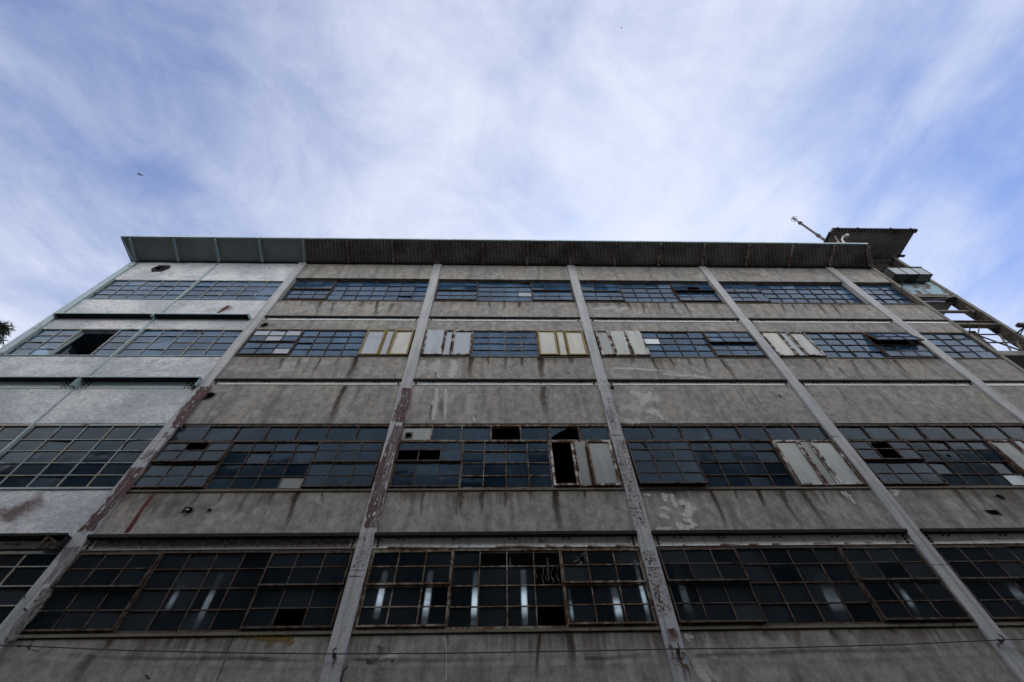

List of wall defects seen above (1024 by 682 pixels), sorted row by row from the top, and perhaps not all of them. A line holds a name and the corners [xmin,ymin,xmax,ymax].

leakage [415,358,473,420]
corrosion [125,494,155,532]
corrosion [643,551,691,675]